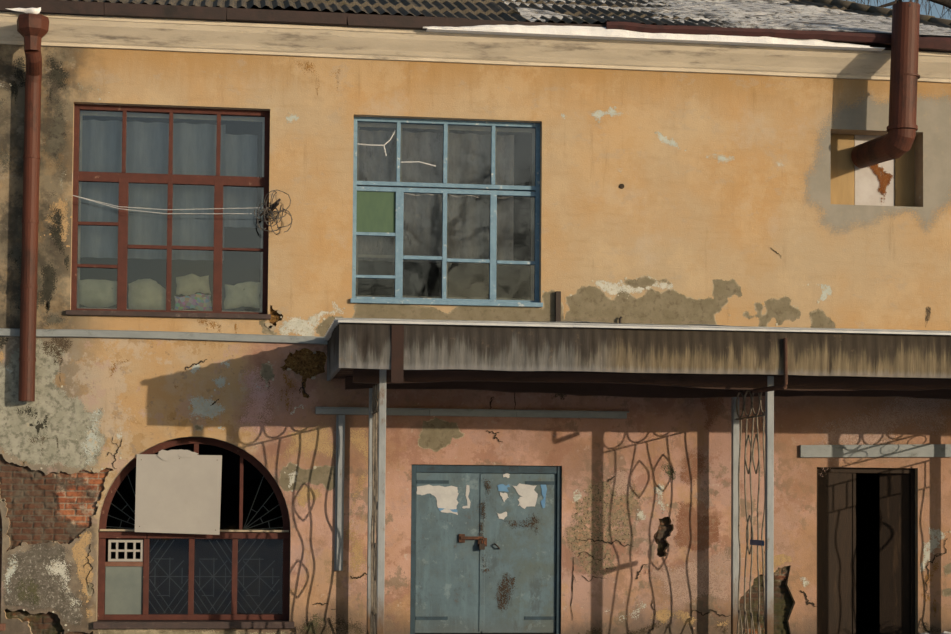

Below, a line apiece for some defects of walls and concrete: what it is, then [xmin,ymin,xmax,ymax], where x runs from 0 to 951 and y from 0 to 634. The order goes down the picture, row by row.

leakage [41,54,70,172]
corrosion [867,164,893,202]
leakage [37,190,69,326]
leakage [41,337,73,386]
peeling [188,360,230,431]
flaking render [259,275,835,415]
flaking render [279,461,336,492]
flaking render [0,454,288,634]
flaking render [562,470,646,579]
flaking render [653,484,676,563]
peeling [919,527,951,572]